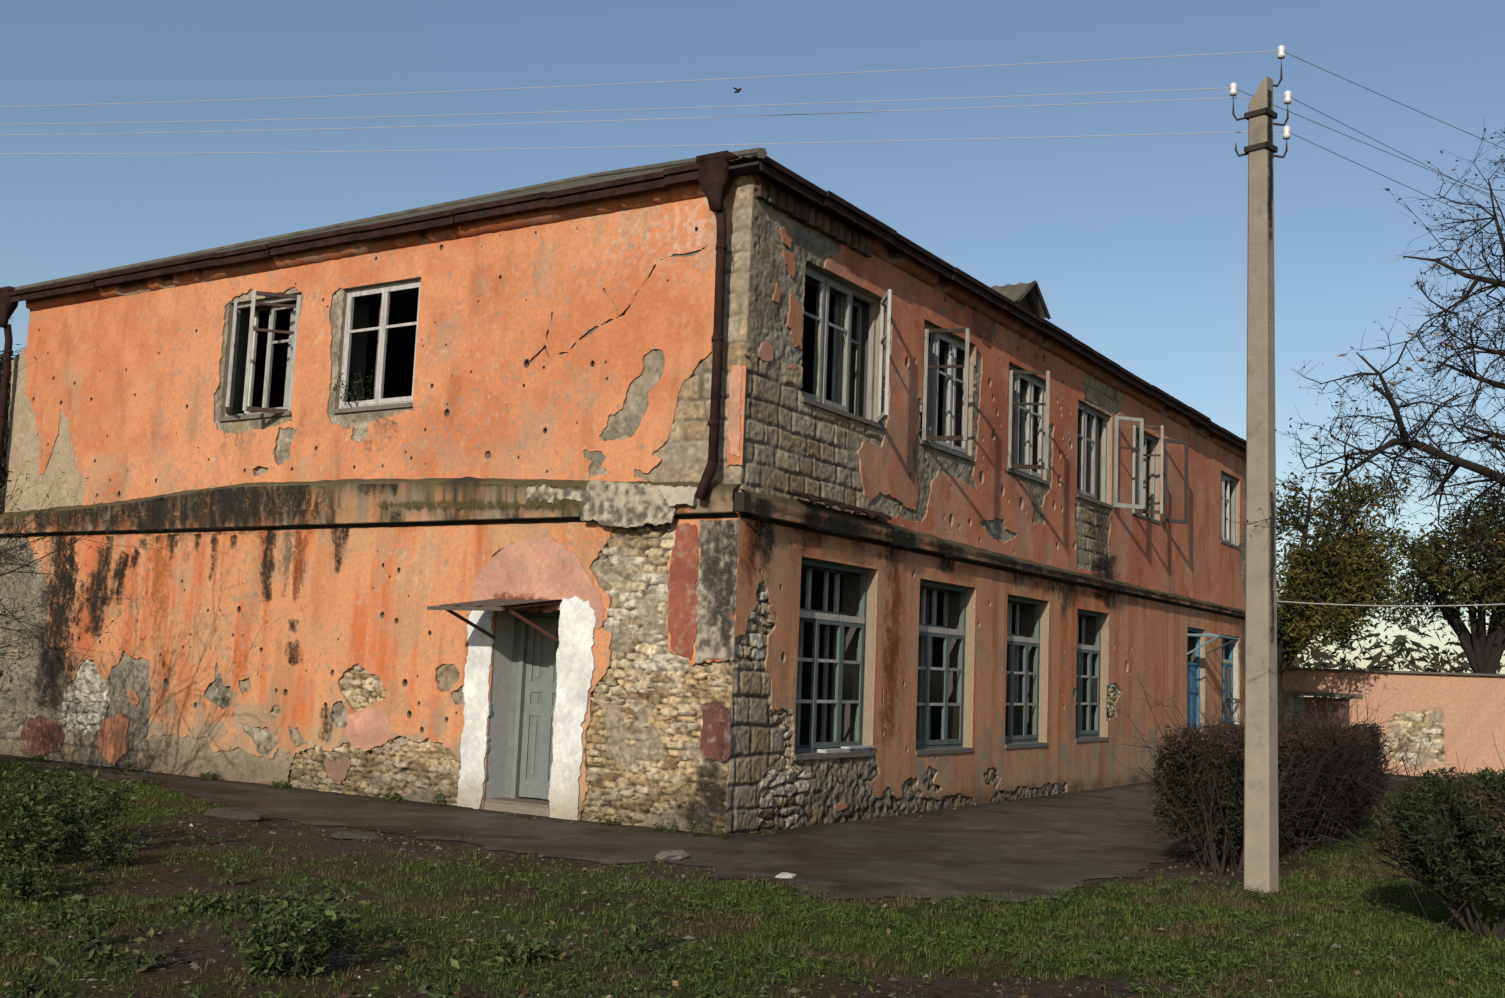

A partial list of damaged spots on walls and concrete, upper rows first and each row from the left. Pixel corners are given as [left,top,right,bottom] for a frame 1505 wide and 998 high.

crack [650,248,705,276]
crack [528,289,629,363]
peeling [4,346,85,512]
flaking render [1083,373,1124,416]
damp [331,524,349,572]
damp [380,498,564,521]
flaking render [524,174,1066,835]
flaking render [1074,497,1110,572]
damp [34,533,236,711]
flaking render [0,651,464,806]